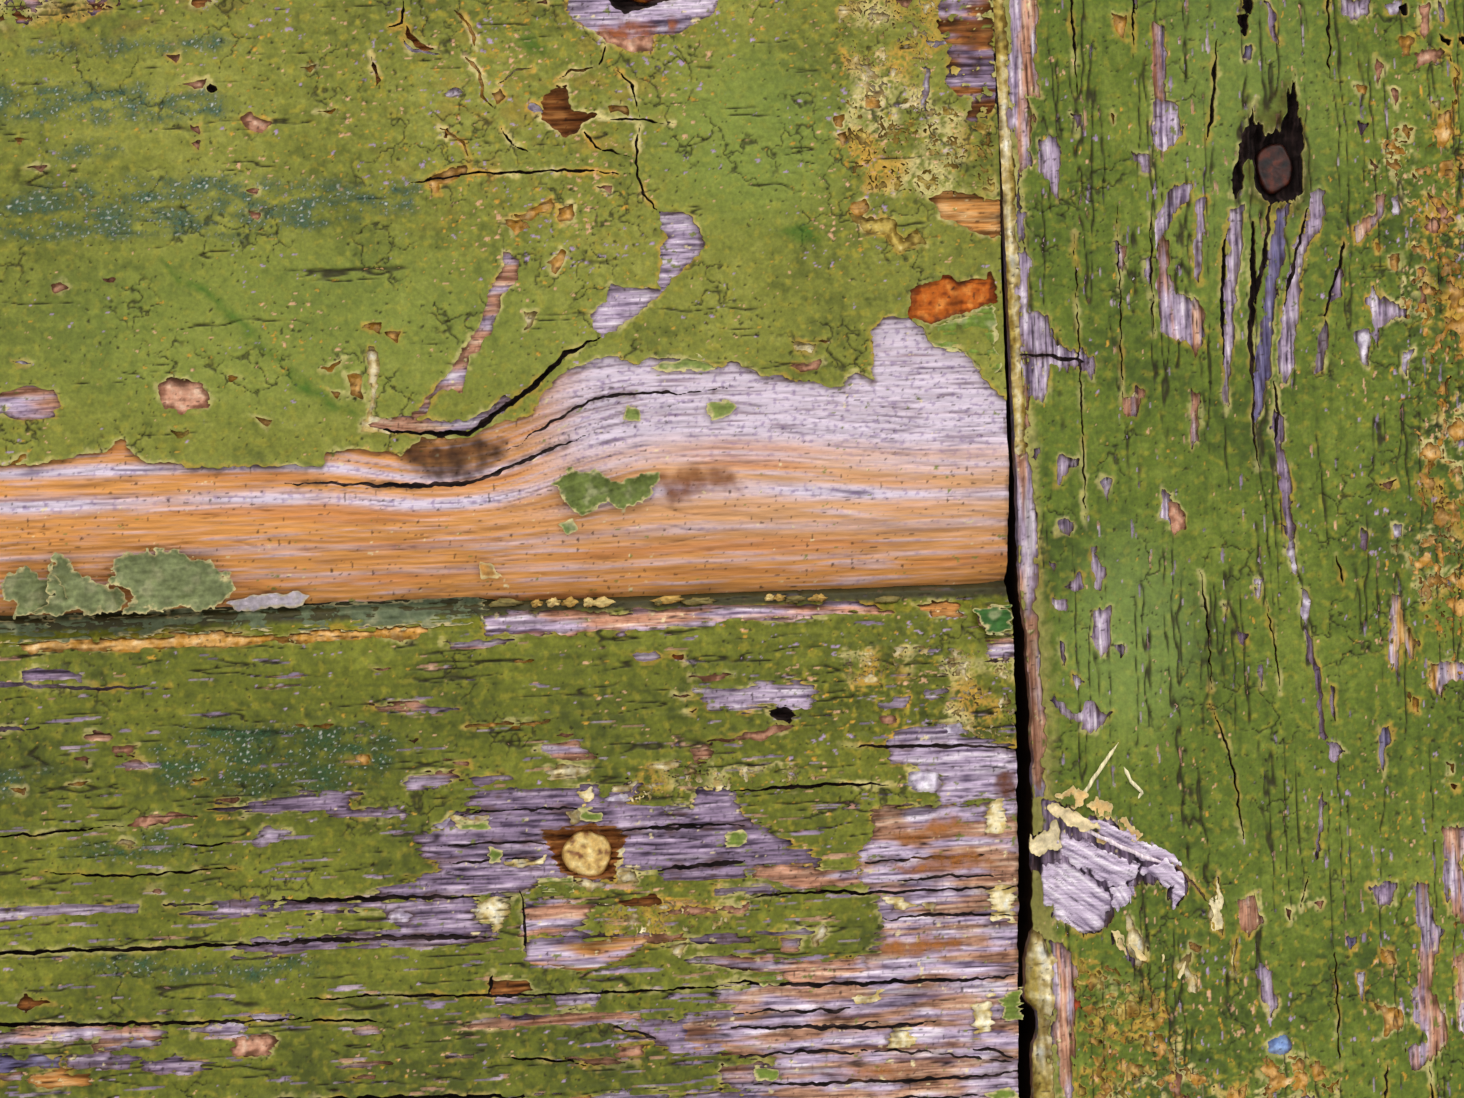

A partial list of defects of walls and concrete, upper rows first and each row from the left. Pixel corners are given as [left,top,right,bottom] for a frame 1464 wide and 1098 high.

peeling [566,0,718,52]
peeling [590,212,705,337]
crack [1020,251,1085,504]
crack [1116,222,1154,380]
crack [1220,206,1308,466]
crack [1323,243,1344,317]
peeling [0,249,1009,683]
peeling [1052,546,1124,658]
crack [1201,574,1211,676]
crack [1215,718,1243,835]
peeling [116,604,1143,1098]
peeling [0,993,294,1081]